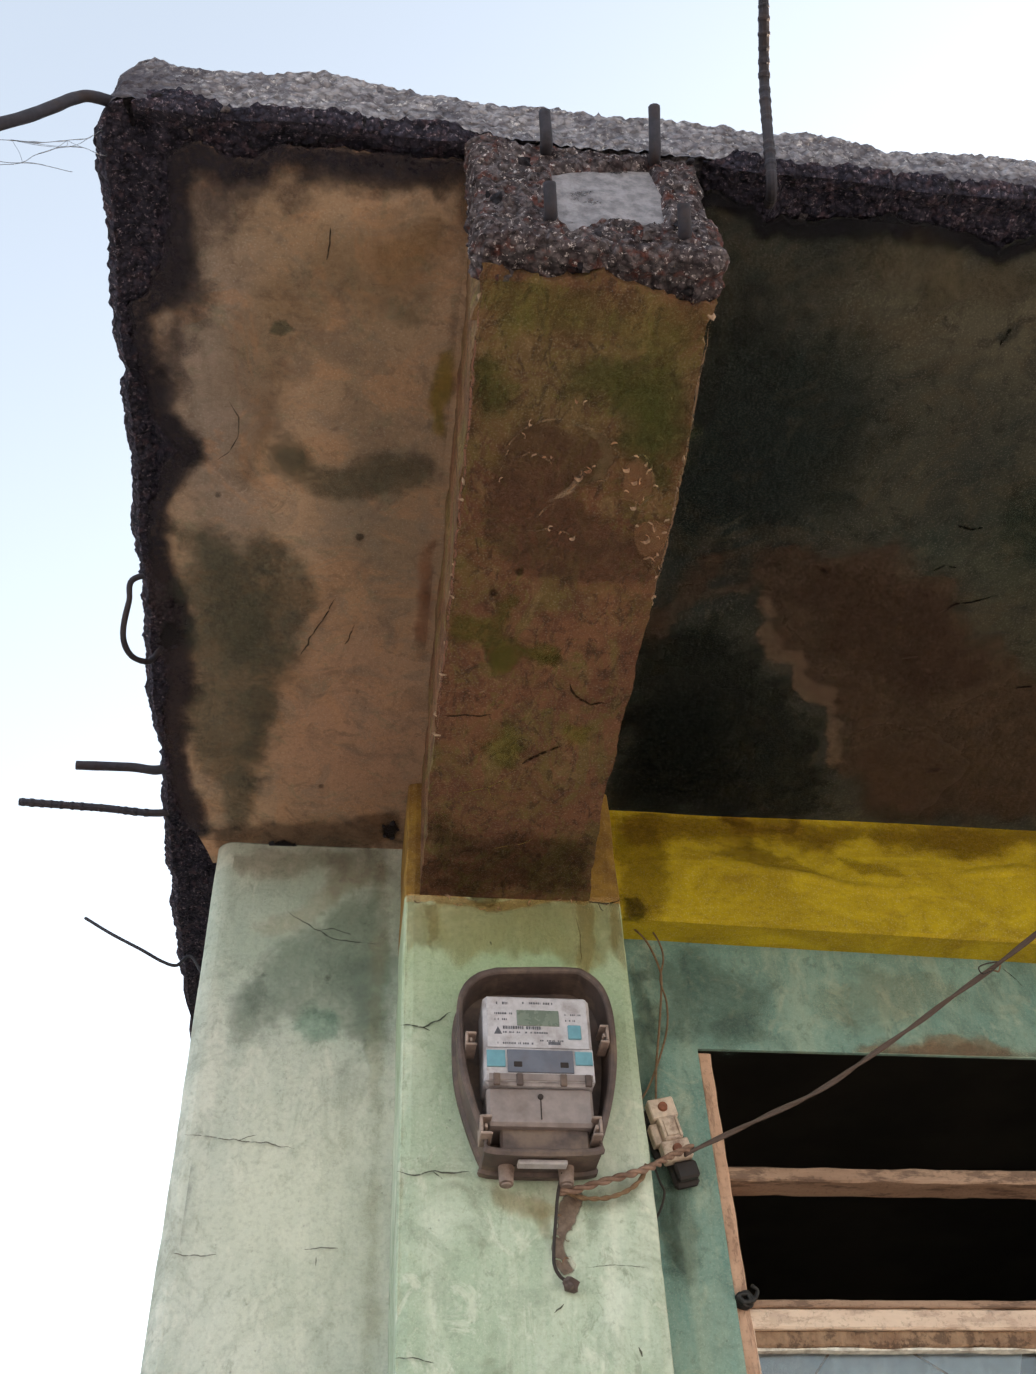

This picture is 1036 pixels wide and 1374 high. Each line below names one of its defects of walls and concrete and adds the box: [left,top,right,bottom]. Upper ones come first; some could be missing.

damp [128,139,466,837]
spalling [0,0,1036,1032]
damp [617,546,1036,819]
crack [185,1134,295,1149]
crack [290,913,372,944]
crack [405,1012,450,1031]